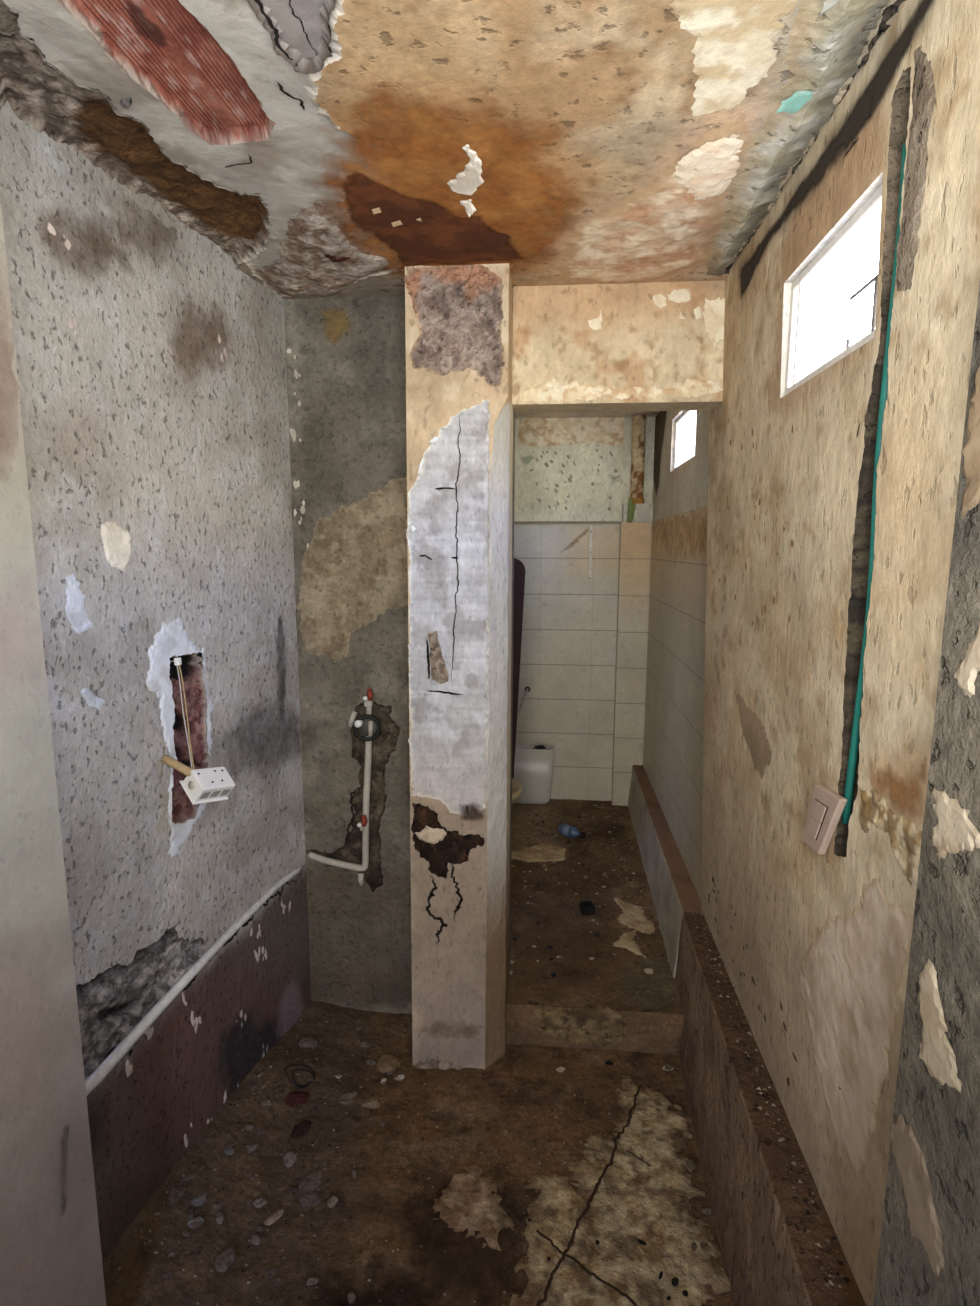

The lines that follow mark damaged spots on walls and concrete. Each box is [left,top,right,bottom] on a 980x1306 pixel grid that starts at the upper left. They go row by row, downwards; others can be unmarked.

peeling [820,0,838,15]
peeling [776,91,814,113]
peeling [559,0,798,346]
corrosion [343,174,520,266]
spalling [0,0,505,944]
spalling [76,926,206,1080]
spalling [659,1271,706,1306]